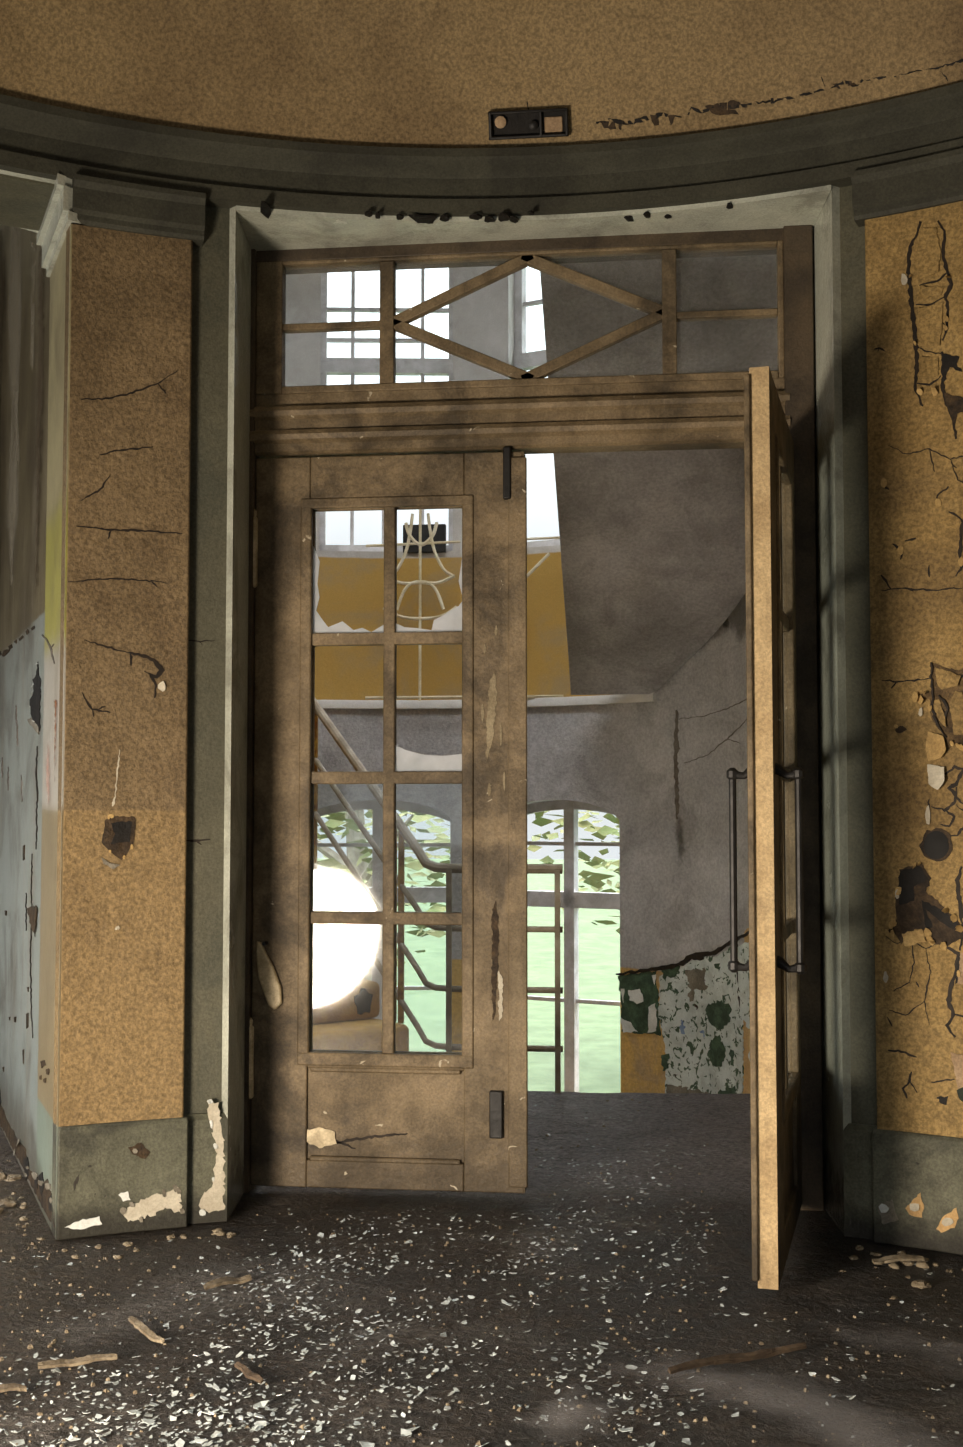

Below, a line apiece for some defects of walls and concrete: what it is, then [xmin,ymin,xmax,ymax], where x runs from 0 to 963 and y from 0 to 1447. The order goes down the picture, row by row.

crack [874,220,963,591]
peeling [27,662,41,735]
crack [42,635,166,698]
peeling [911,662,963,790]
flaking render [102,814,136,869]
peeling [26,905,37,935]
peeling [884,861,963,984]
peeling [616,931,750,1096]
peeling [878,1193,924,1224]
peeling [937,1208,959,1233]
peeling [0,1091,790,1447]
peeling [796,1347,890,1414]